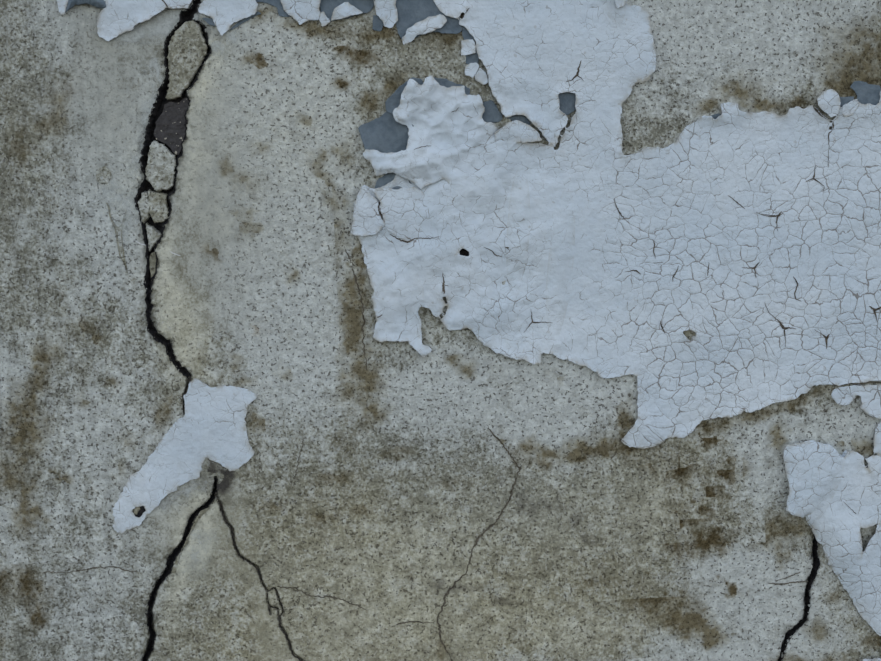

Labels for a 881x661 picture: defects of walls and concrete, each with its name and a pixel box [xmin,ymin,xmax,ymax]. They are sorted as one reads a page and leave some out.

crack [134,0,212,415]
peeling [56,0,881,449]
crack [729,196,783,231]
crack [806,104,834,191]
crack [765,305,830,349]
peeling [112,378,257,534]
crack [44,565,136,573]
crack [142,477,366,661]
crack [778,536,820,661]